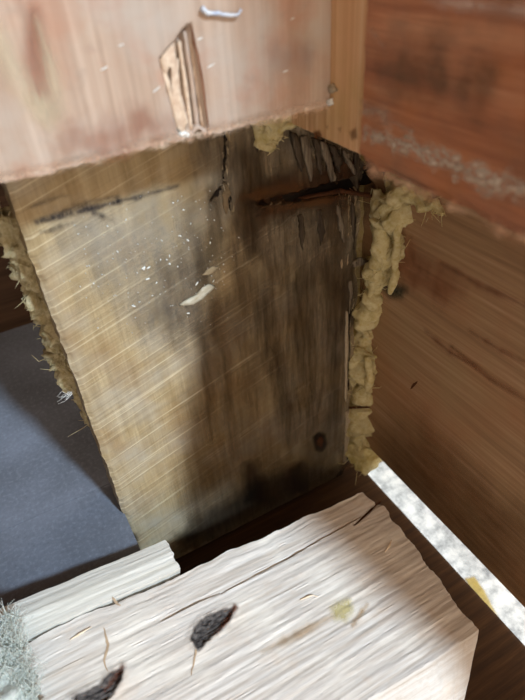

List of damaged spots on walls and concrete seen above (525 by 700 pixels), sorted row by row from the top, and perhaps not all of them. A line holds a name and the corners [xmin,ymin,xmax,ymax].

spalling [159,22,209,138]
water stain [36,199,122,223]
crack [210,131,232,214]
water stain [204,124,360,457]
water stain [180,346,345,554]
crack [160,501,382,621]